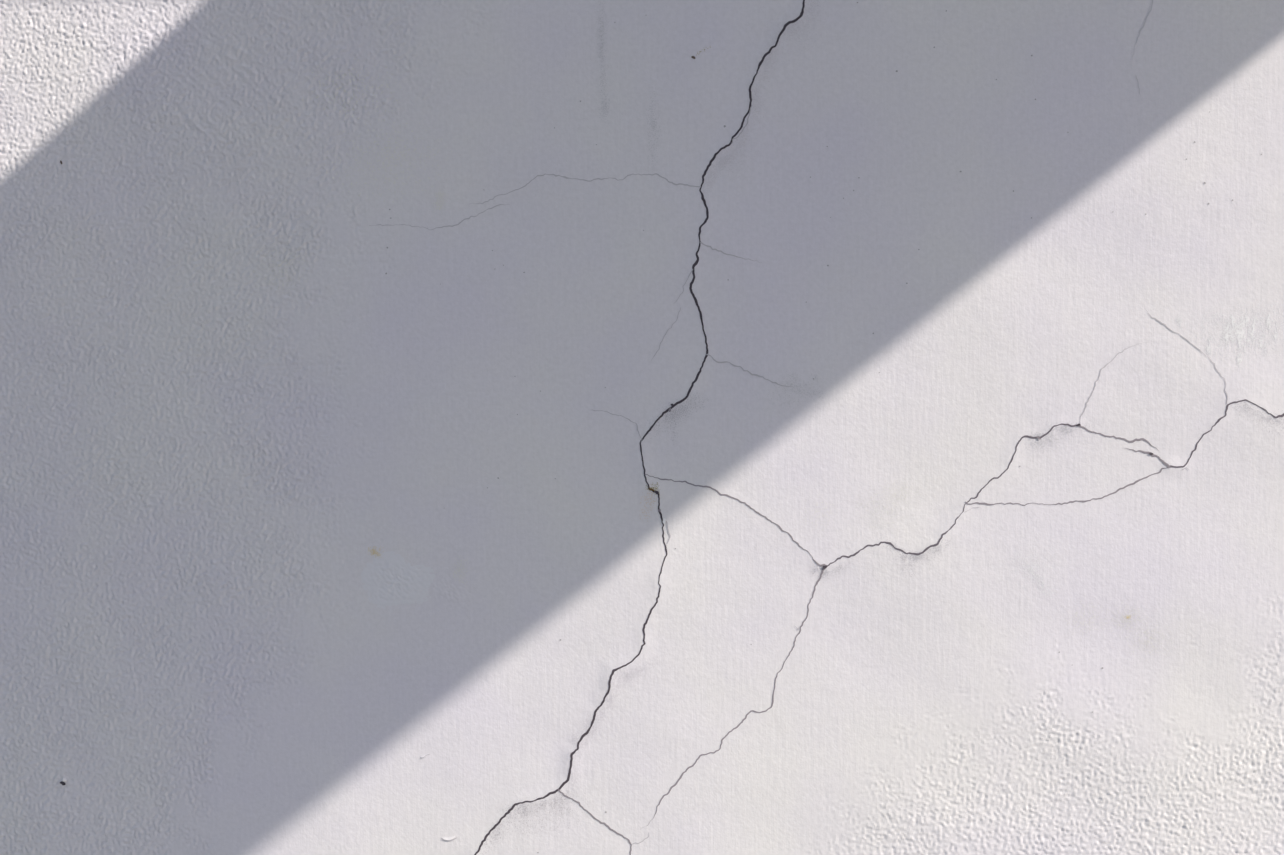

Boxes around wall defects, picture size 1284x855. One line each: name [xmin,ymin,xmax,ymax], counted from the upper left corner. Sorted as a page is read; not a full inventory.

crack [369,0,1284,855]